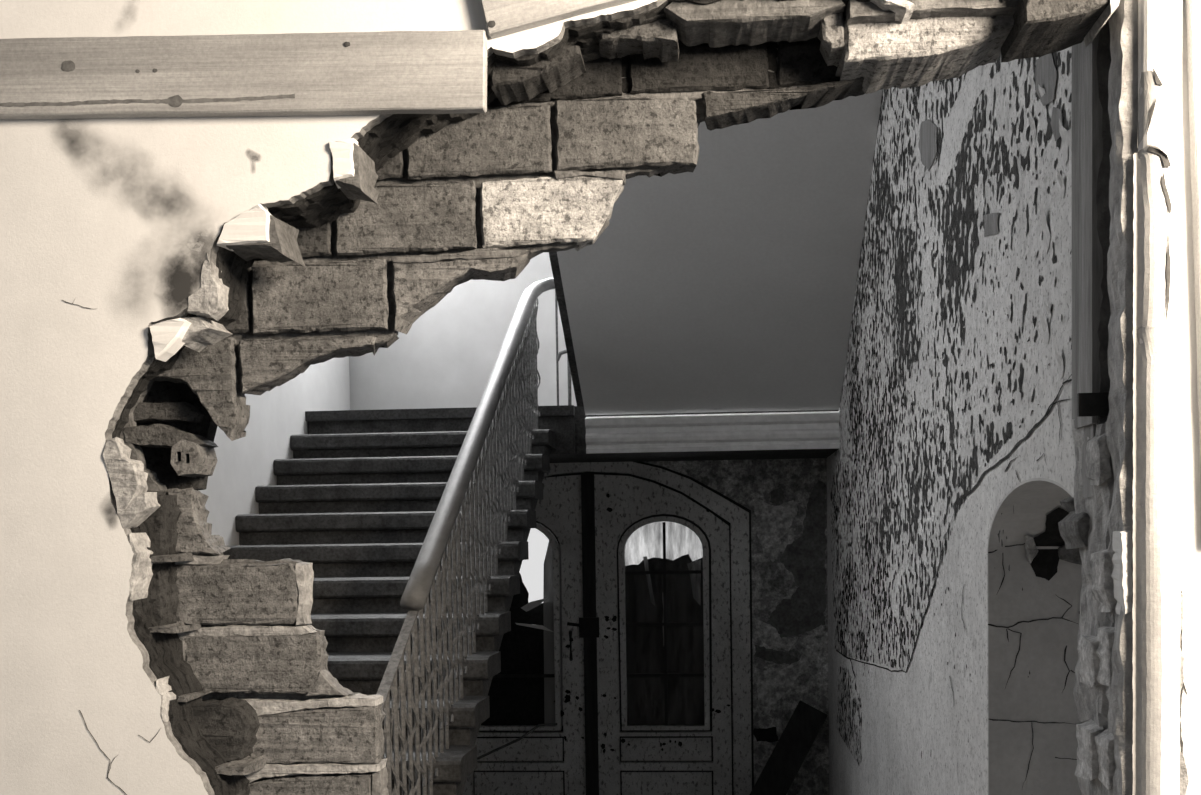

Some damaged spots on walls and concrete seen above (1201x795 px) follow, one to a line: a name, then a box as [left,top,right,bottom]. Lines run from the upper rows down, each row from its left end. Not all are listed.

flaking render [103,0,1120,718]
peeling [1024,67,1172,795]
crack [836,374,1077,689]
crack [79,710,127,795]
flaking render [156,634,386,778]
flaking render [237,773,373,795]
spalling [753,727,779,742]
peeling [836,667,868,765]
crack [989,719,1077,788]